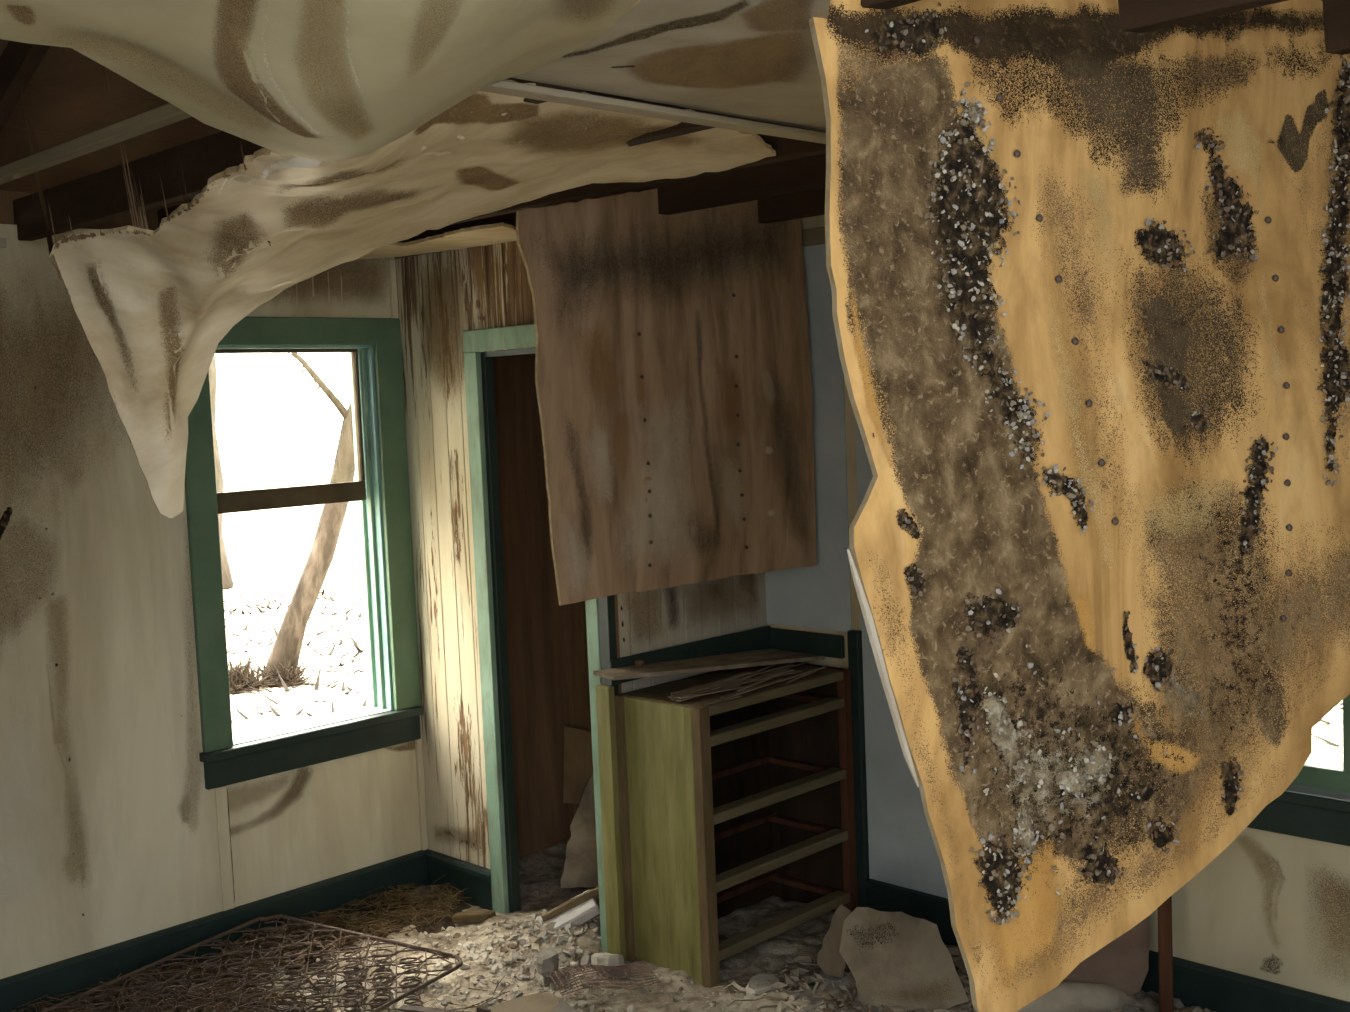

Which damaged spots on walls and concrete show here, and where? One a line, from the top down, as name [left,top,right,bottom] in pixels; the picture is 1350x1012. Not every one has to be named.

water stain [865,2,947,57]
water stain [412,93,703,156]
peeling [961,99,992,150]
water stain [220,157,421,230]
water stain [84,259,139,393]
water stain [156,285,186,444]
peeling [1015,394,1038,452]
water stain [864,56,1350,996]
water stain [0,253,130,896]
peeling [1074,594,1096,652]
peeling [1131,713,1202,776]
peeling [970,687,1122,995]